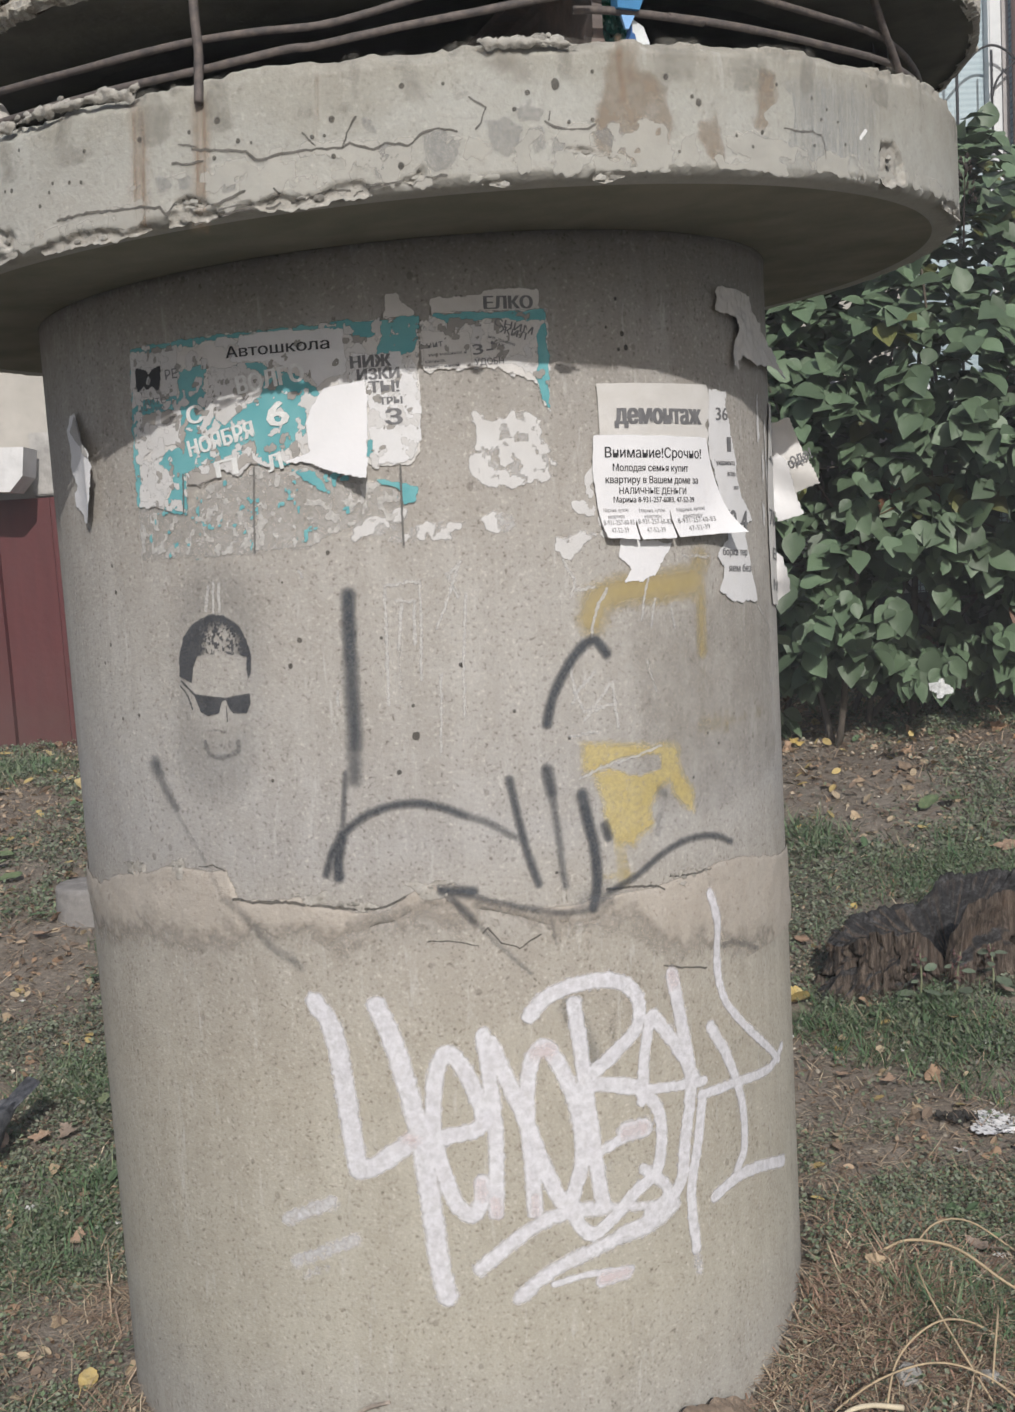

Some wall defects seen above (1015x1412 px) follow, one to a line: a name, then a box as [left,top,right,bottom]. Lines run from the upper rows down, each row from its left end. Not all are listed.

spalling [0,0,89,34]
spalling [935,0,980,91]
crack [57,96,487,225]
peeling [159,116,432,229]
crack [545,111,596,130]
peeling [447,90,961,225]
peeling [0,186,152,266]
crack [199,864,406,911]
crack [428,927,541,949]
crack [664,963,707,971]